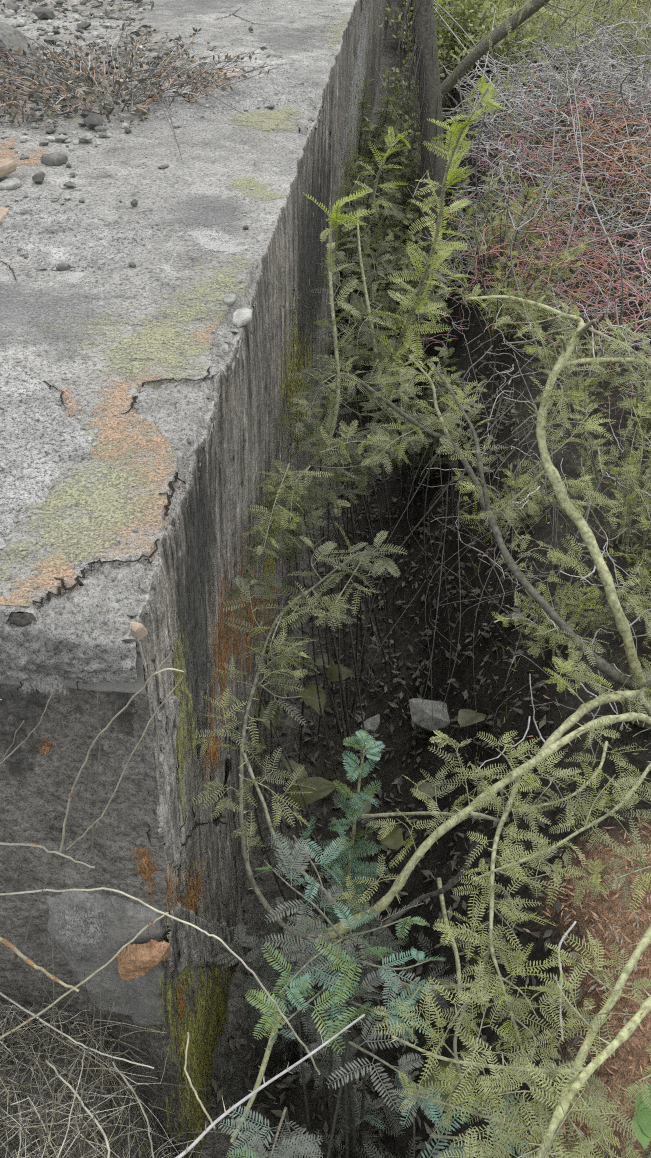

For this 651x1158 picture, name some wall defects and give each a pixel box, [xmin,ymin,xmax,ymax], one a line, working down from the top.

spalling [132,274,257,545]
spalling [0,560,160,685]
rust [204,560,278,798]
rust [135,848,203,914]